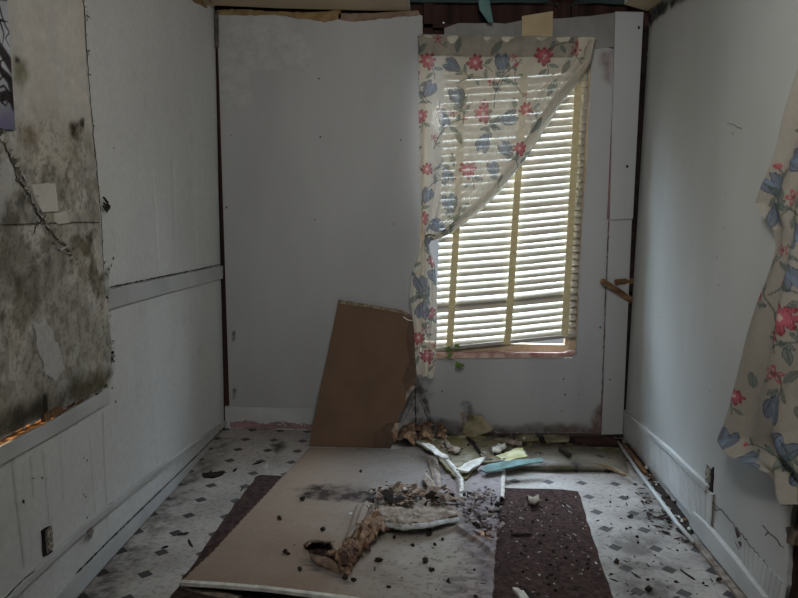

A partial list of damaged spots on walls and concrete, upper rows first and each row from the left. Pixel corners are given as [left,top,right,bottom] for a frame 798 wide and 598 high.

leakage [647,0,682,25]
crack [0,0,222,288]
leakage [0,395,48,437]